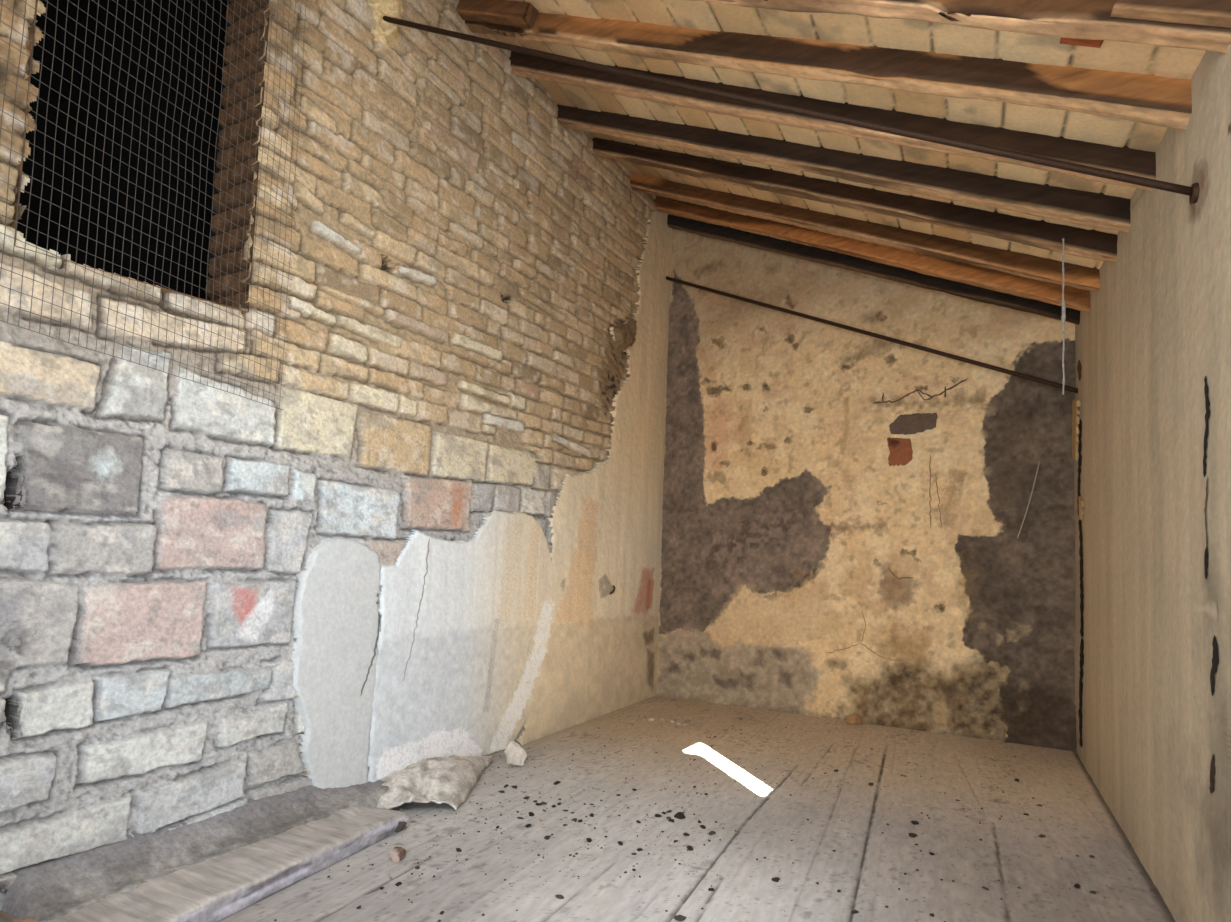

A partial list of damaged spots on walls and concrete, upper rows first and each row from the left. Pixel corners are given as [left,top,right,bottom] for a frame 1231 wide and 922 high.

flaking render [884,337,929,392]
spalling [0,569,42,693]
peeling [224,582,275,643]
flaking render [367,211,837,782]
damp [656,546,1077,752]
flaking render [899,548,922,564]
spalling [934,338,1084,681]